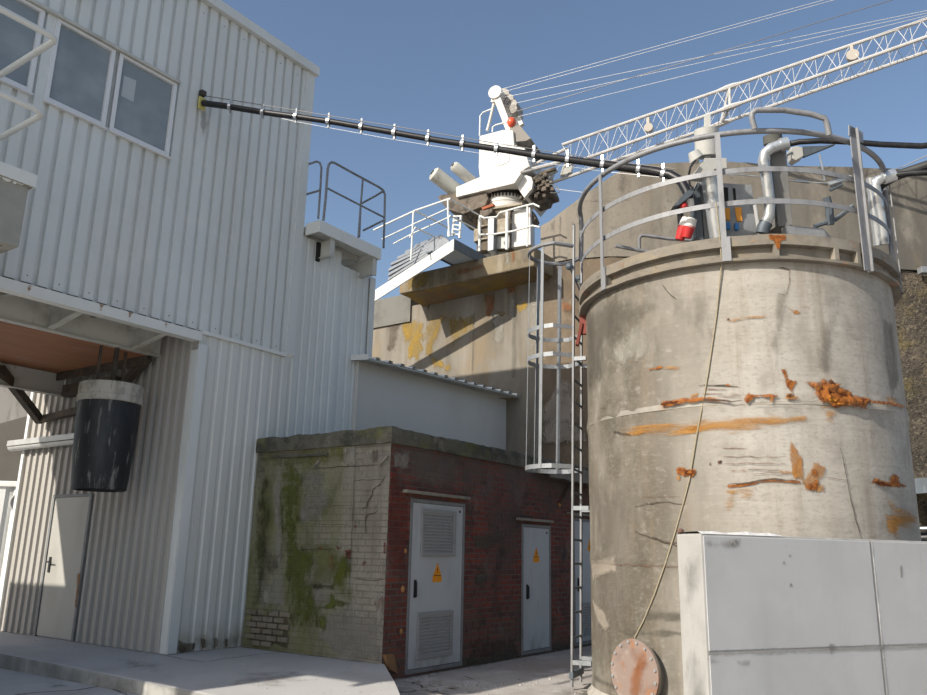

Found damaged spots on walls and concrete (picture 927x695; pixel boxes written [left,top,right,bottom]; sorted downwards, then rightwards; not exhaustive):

peeling [402,316,473,370]
rust [661,369,905,416]
rust [614,416,806,435]
rust [676,467,695,480]
rust [709,443,825,491]
rust [872,475,906,487]
crack [300,465,386,608]
rust [887,504,914,534]
rust [631,659,645,695]